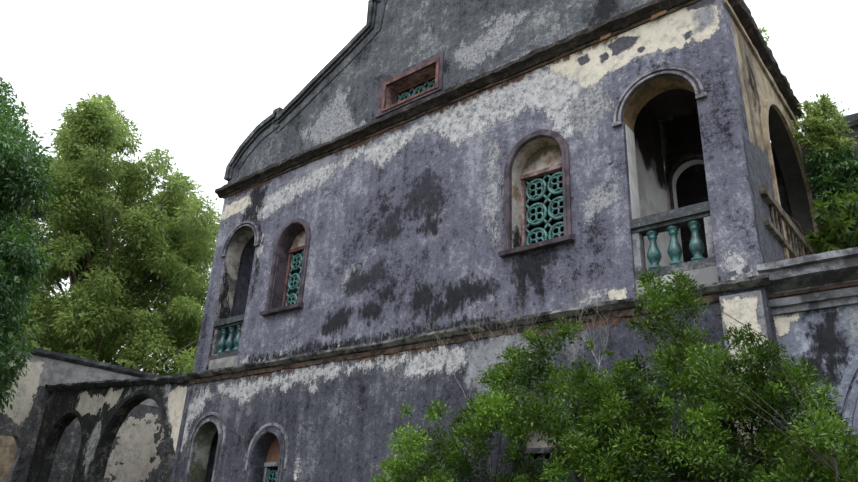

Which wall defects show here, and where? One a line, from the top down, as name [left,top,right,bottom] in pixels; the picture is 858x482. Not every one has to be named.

peeling [221,0,721,247]
damp [248,168,504,363]
damp [510,226,557,306]
peeling [721,296,802,380]
damp [797,307,855,387]
peeling [76,344,469,482]
peeling [735,412,783,469]